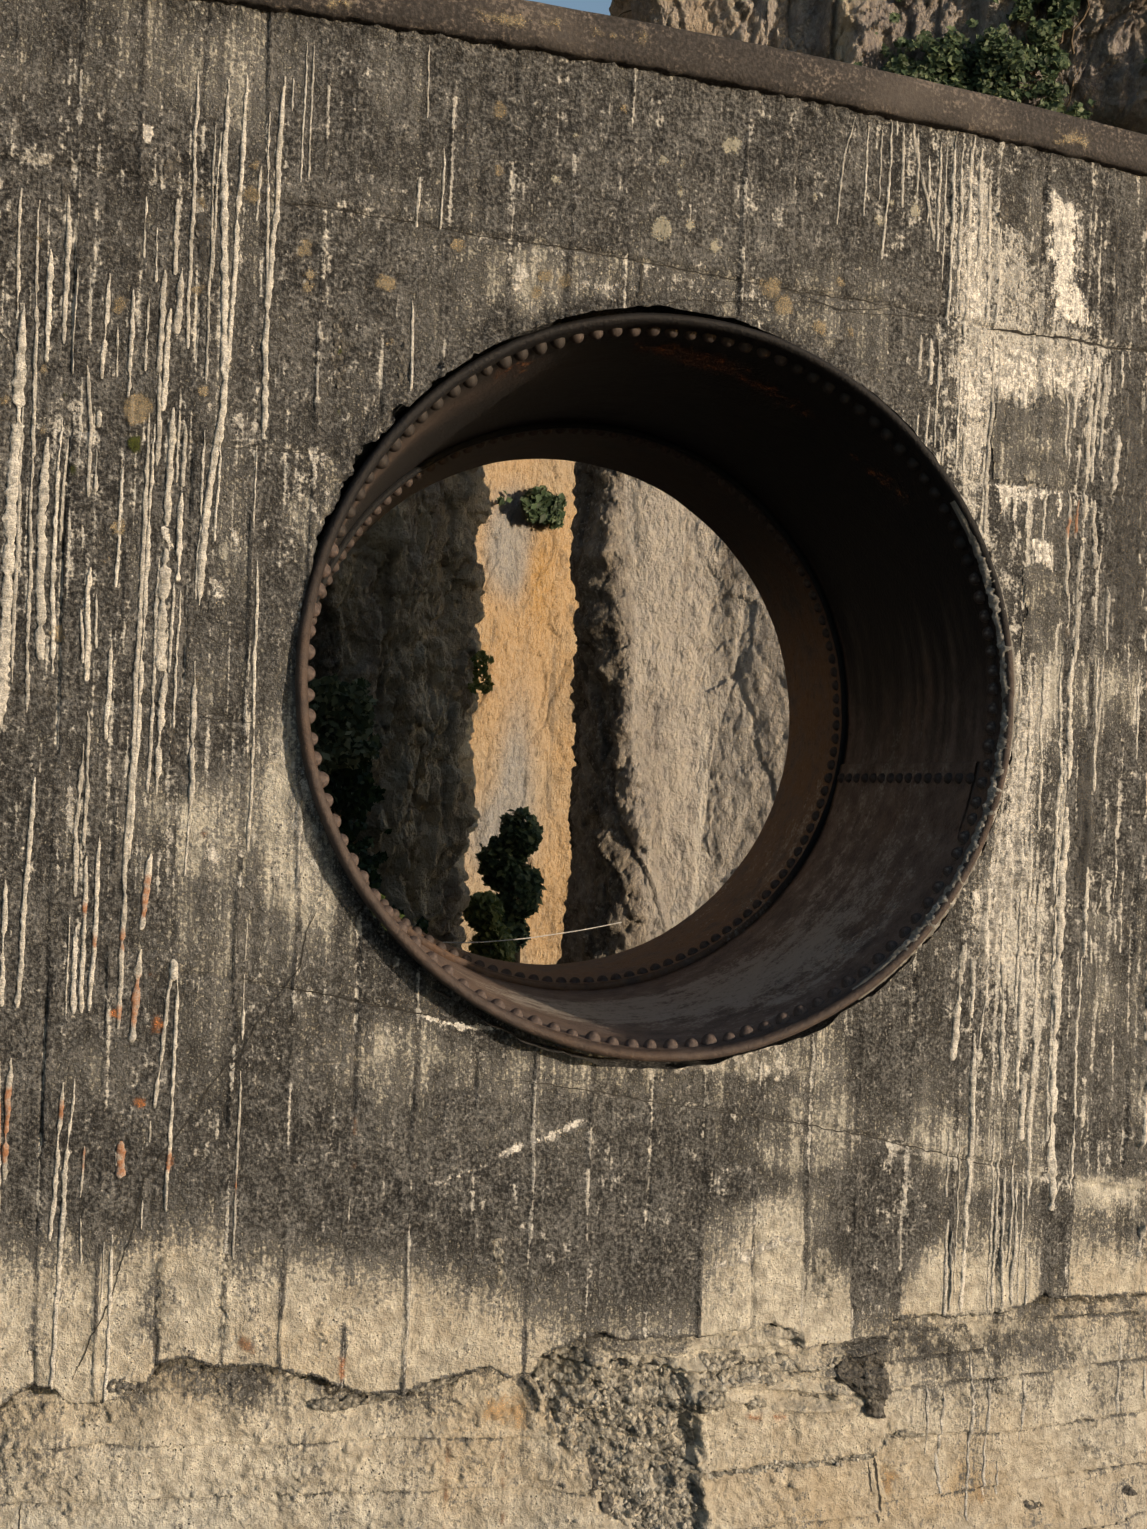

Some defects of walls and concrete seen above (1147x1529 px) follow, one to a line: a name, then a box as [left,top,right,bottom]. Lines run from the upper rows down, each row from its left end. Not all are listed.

damp [0,42,315,1042]
damp [836,116,1147,1316]
damp [0,1058,13,1210]
damp [148,959,179,1212]
damp [421,1014,498,1031]
damp [48,1079,85,1390]
spalling [82,1254,472,1412]
spalling [491,1238,507,1288]
spalling [1038,1293,1147,1304]
spalling [533,1319,926,1529]
crack [868,1458,882,1524]
spalling [1122,1485,1137,1496]